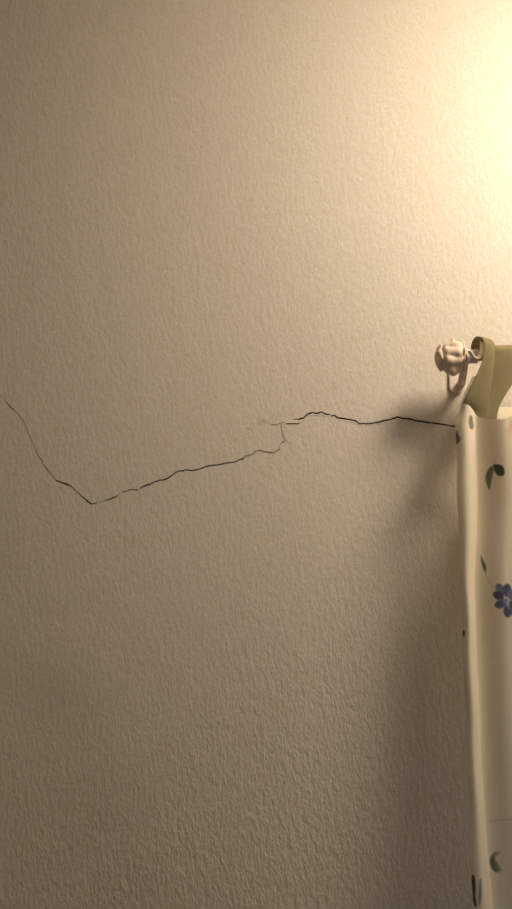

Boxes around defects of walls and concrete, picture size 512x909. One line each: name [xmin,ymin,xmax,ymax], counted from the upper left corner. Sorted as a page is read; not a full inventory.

crack [38,411,455,505]